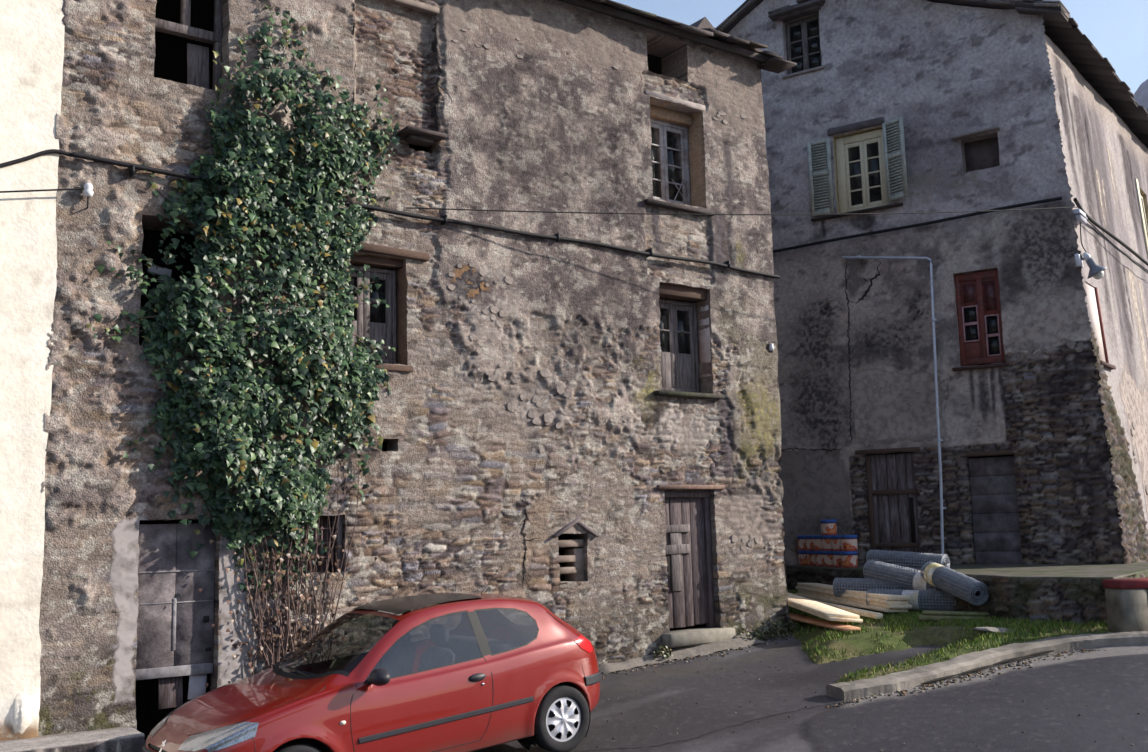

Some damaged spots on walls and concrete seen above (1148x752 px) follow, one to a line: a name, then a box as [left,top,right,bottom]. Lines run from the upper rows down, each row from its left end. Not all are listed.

crack [781,262,881,452]
crack [519,498,535,586]